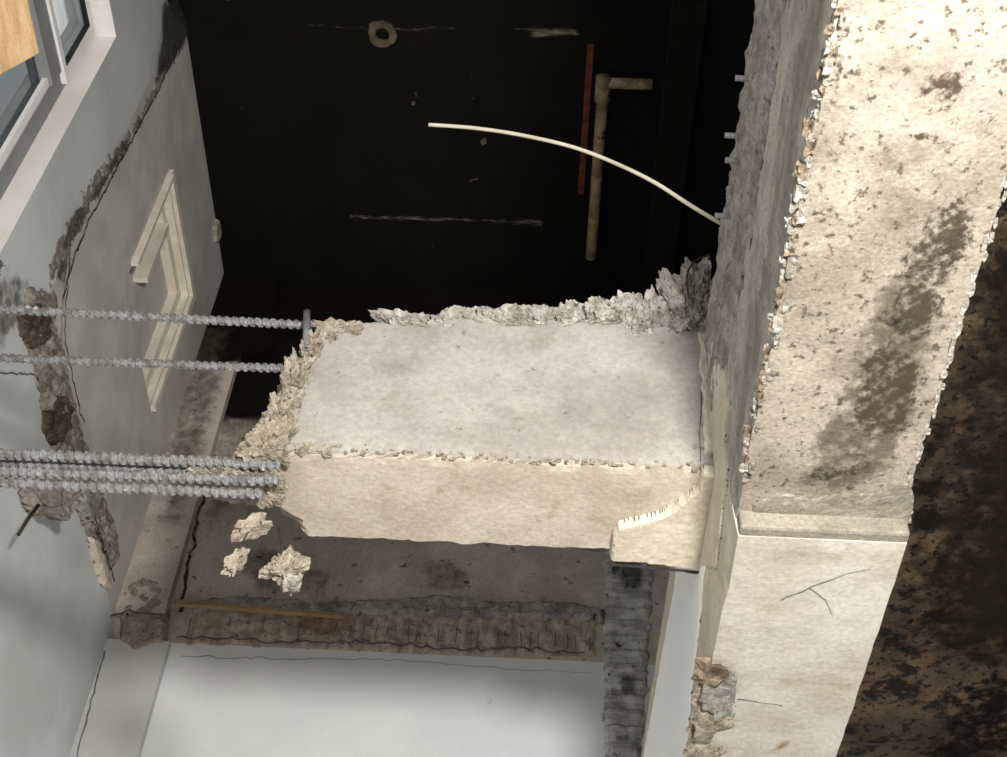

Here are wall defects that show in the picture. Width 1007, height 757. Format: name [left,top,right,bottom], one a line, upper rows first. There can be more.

spalling [16,42,185,453]
spalling [294,0,791,574]
spalling [739,0,846,482]
damp [943,227,972,264]
damp [850,283,944,438]
damp [810,462,871,479]
spalling [75,479,120,591]
crack [178,496,206,612]
spalling [110,578,606,658]
spalling [682,657,737,757]